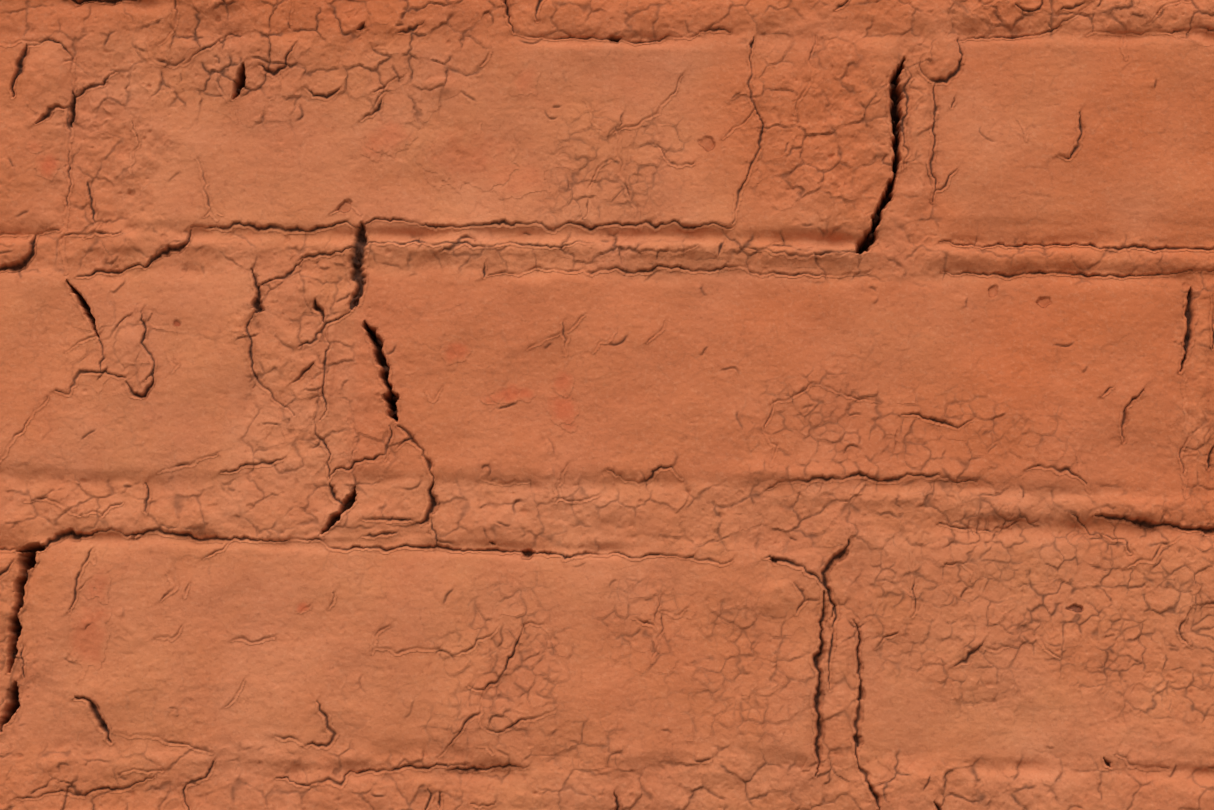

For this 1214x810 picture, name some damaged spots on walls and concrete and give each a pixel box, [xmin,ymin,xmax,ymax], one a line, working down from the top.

crack [69,0,406,122]
crack [501,0,732,46]
crack [1085,0,1214,37]
crack [740,0,1094,261]
crack [0,33,873,735]
crack [761,379,980,490]
crack [938,238,1214,569]
crack [14,693,216,810]
crack [272,619,556,810]
crack [762,509,1039,810]
crack [951,630,1062,669]
crack [1101,751,1171,772]